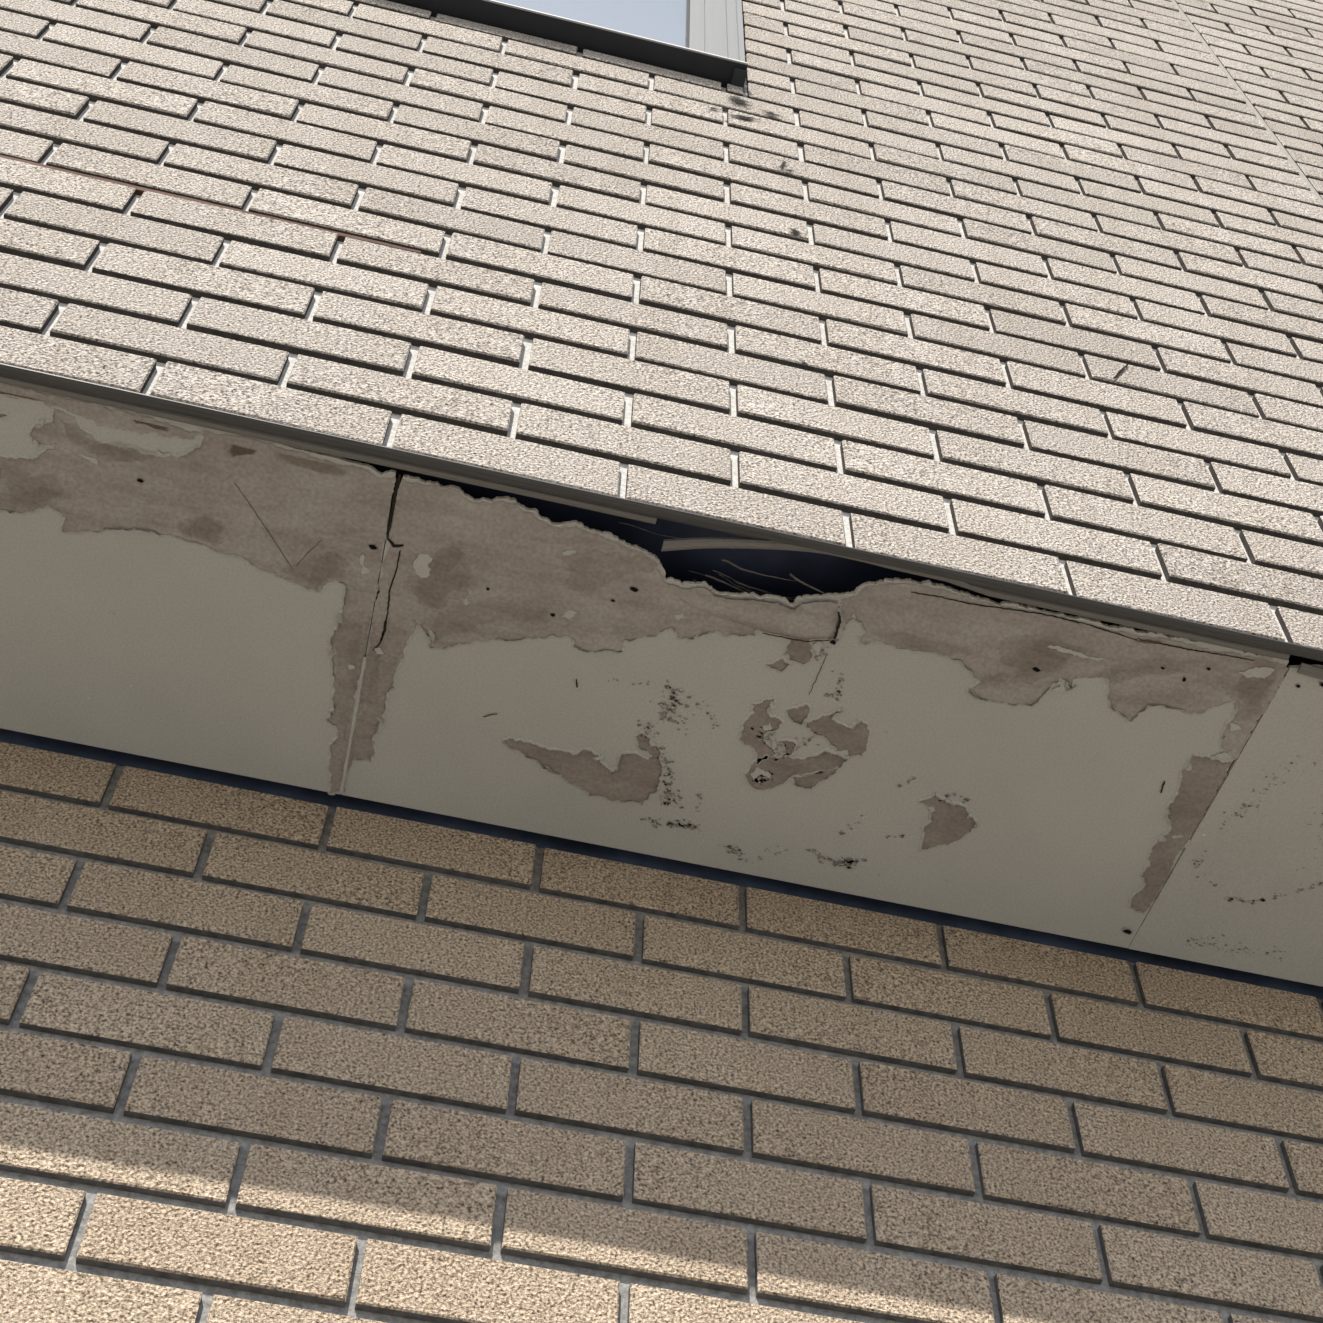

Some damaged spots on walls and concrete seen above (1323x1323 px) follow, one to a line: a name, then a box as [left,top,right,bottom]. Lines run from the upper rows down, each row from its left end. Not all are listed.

crack [373,474,404,651]
peeling [0,383,1323,914]